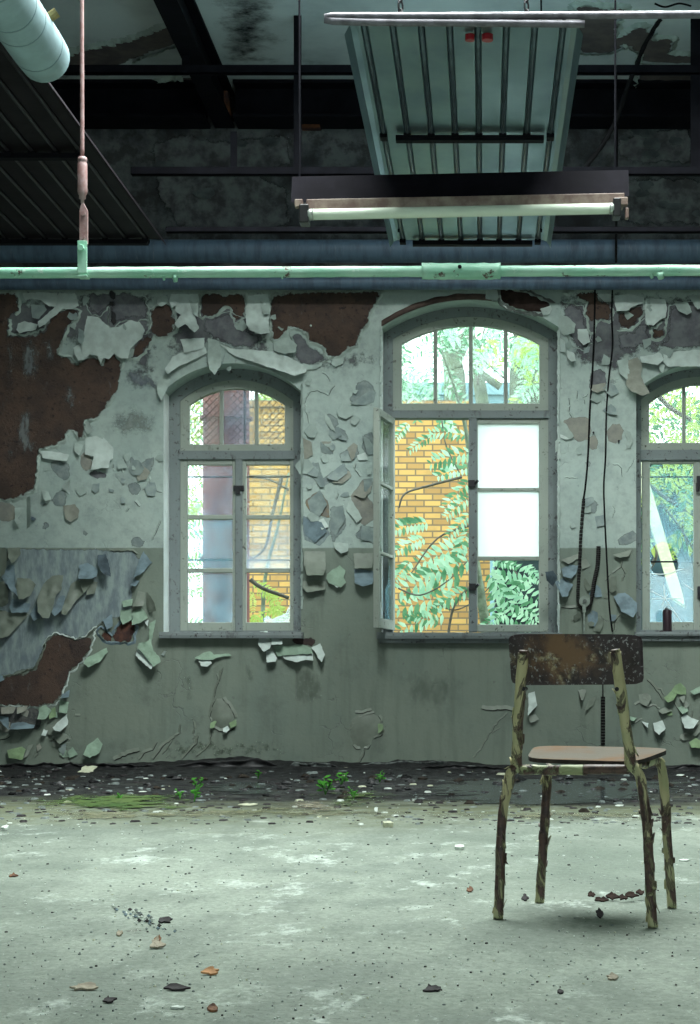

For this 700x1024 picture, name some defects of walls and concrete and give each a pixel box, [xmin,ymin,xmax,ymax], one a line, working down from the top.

leakage [232,1,265,59]
spalling [0,290,700,625]
peeling [0,537,167,744]
peeling [195,651,231,667]
peeling [258,631,325,662]
peeling [7,744,33,760]
peeling [78,738,103,773]
crack [113,719,213,761]